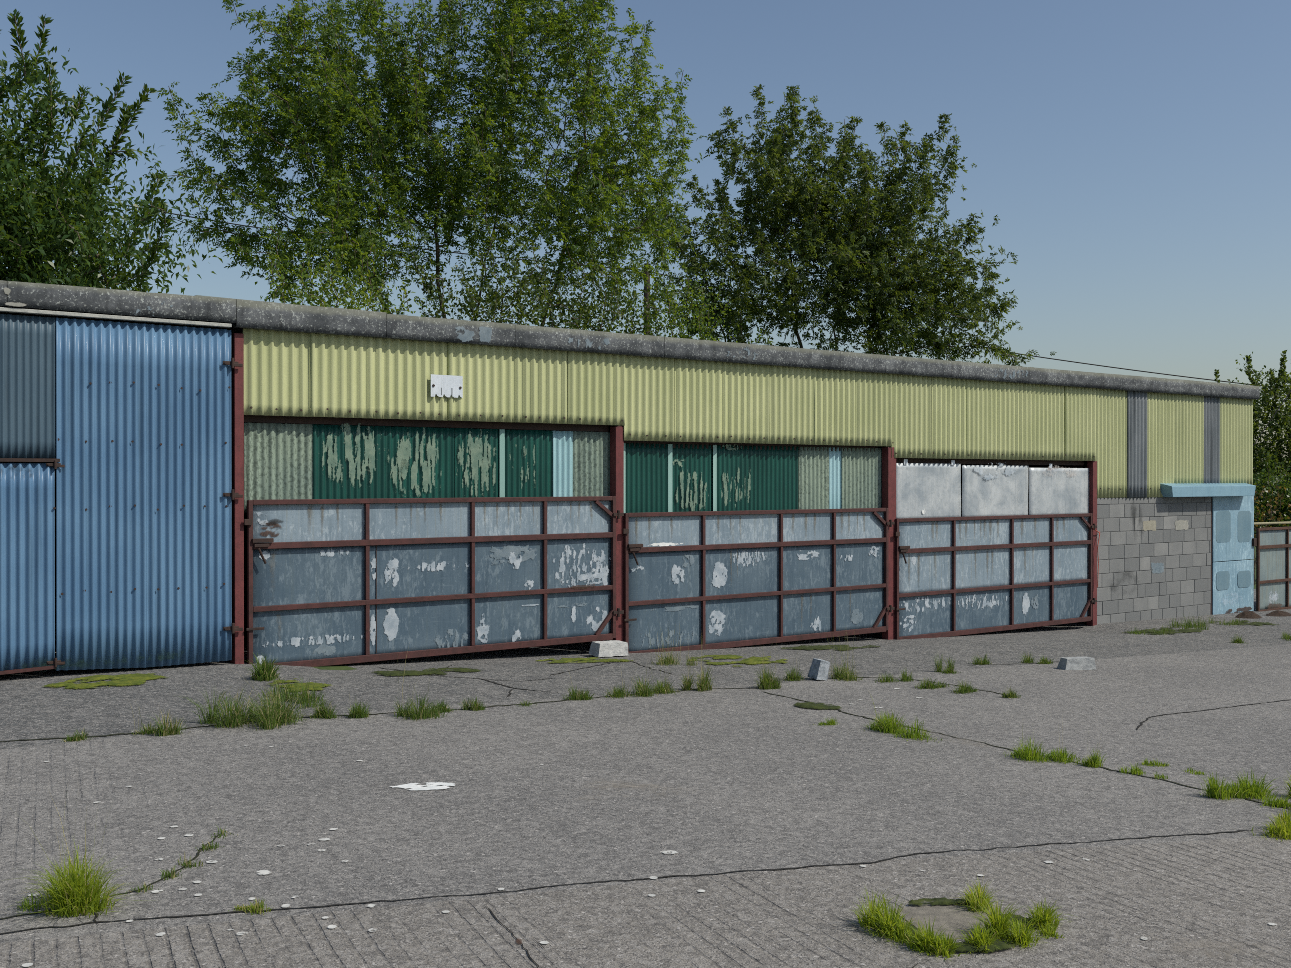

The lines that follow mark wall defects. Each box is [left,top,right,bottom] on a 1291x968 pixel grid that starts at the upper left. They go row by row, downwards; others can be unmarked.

peeling [322,423,442,496]
peeling [458,431,535,497]
peeling [672,459,751,511]
peeling [371,558,469,587]
peeling [490,545,539,606]
peeling [553,544,611,587]
peeling [711,550,766,588]
peeling [257,608,399,664]
peeling [436,614,489,648]
peeling [557,603,607,631]
crack [1136,699,1291,730]
crack [0,830,1249,968]